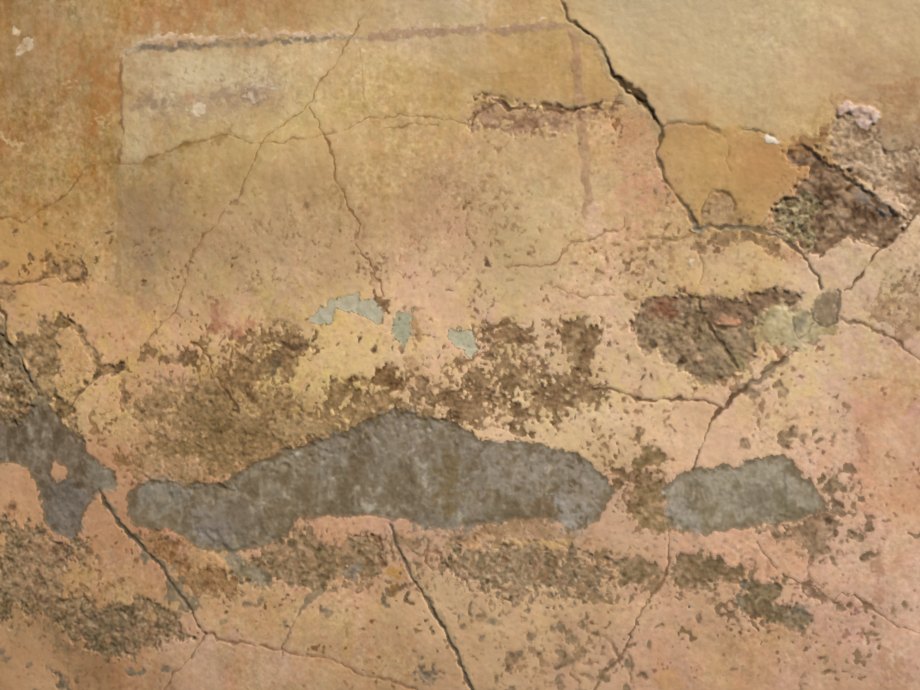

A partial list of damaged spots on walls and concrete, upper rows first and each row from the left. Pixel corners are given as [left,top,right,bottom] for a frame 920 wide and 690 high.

crack [0,5,473,346]
spalling [466,27,920,397]
crack [506,0,920,473]
crack [0,308,122,411]
crack [190,340,241,415]
spalling [0,164,889,690]
crack [99,488,418,690]
crack [388,413,478,690]
crack [589,530,671,690]
crack [756,541,920,634]
spalling [890,600,910,616]